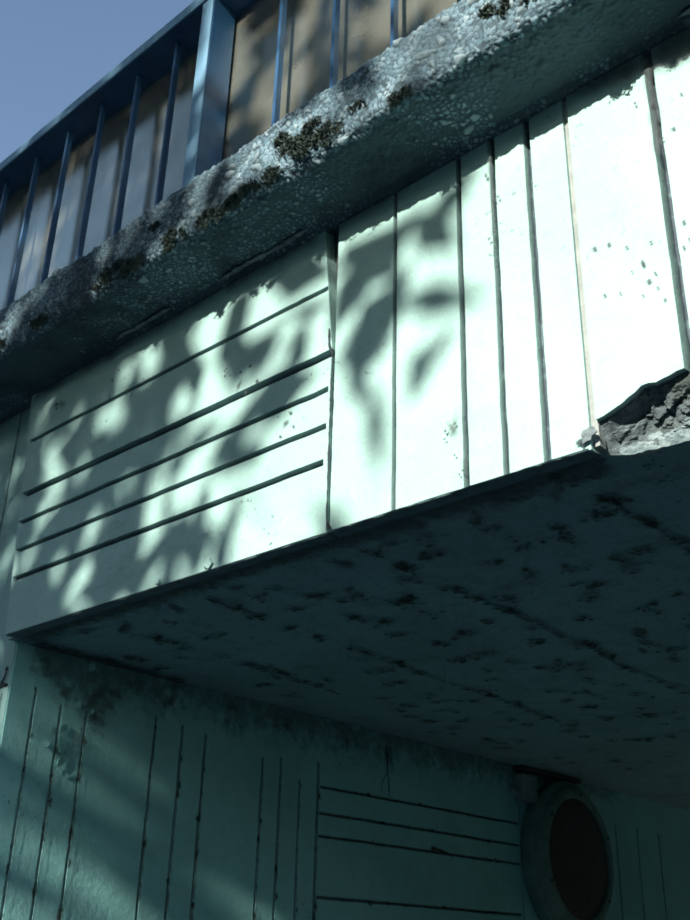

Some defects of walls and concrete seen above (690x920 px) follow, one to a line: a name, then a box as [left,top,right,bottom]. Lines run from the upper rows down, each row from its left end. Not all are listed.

spalling [576,372,690,458]
leakage [16,458,634,683]